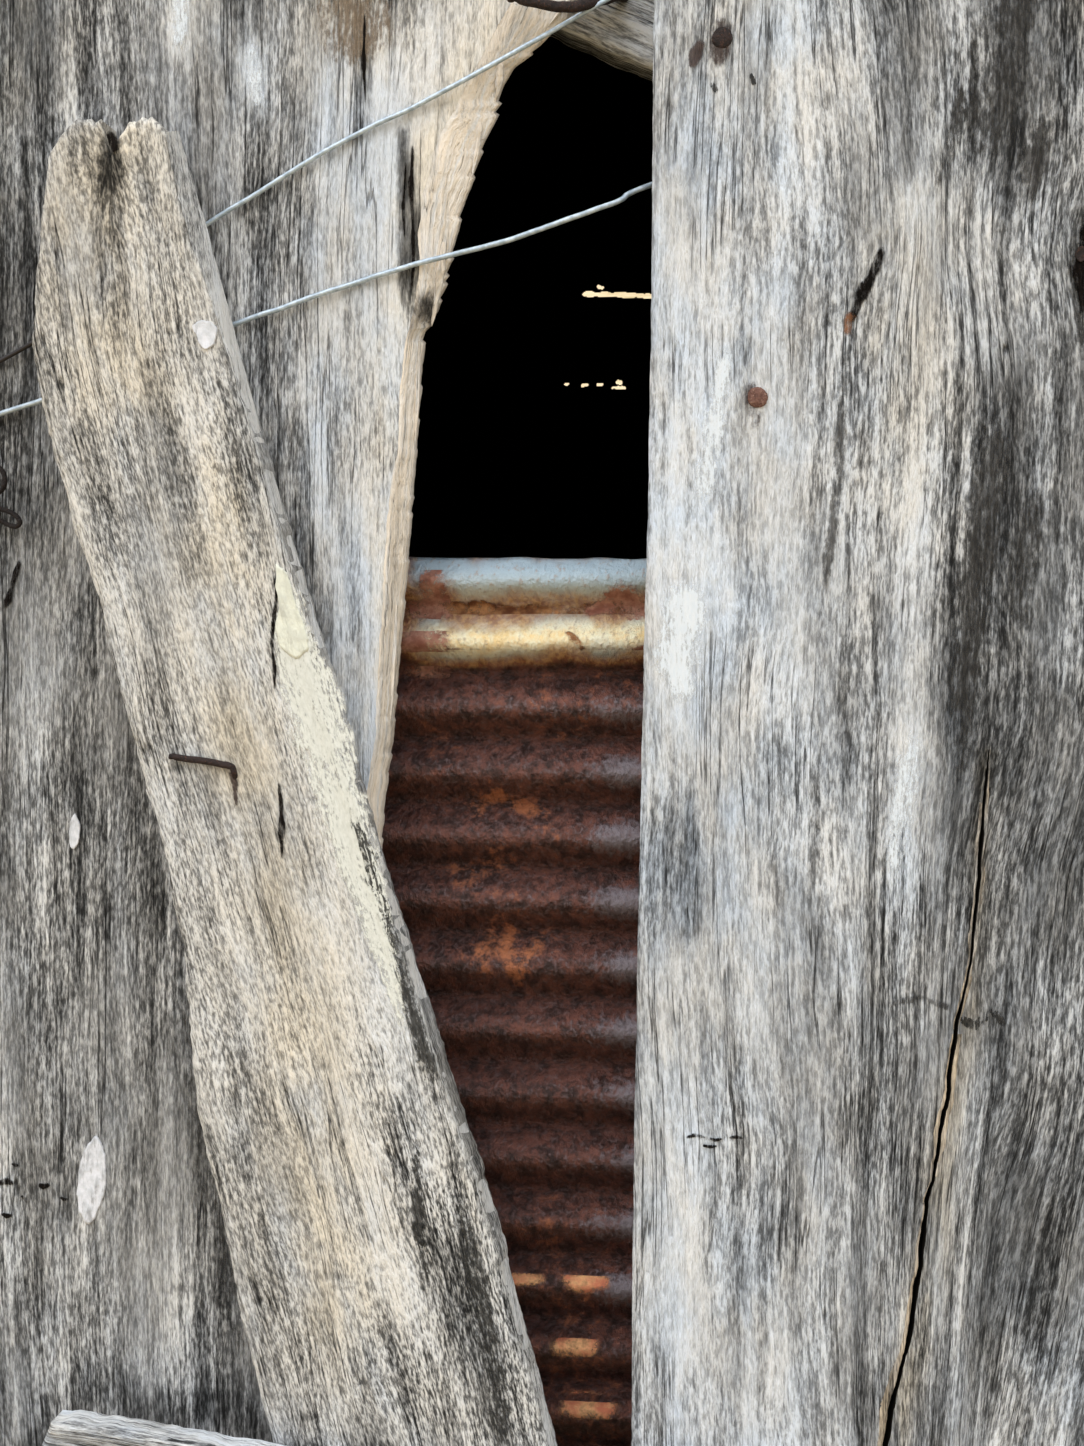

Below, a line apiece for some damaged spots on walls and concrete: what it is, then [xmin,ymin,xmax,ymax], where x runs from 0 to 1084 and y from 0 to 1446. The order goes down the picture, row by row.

corrosion [709,18,731,64]
corrosion [401,570,645,679]
crack [877,749,1005,1446]
corrosion [512,1273,540,1285]
corrosion [564,1275,608,1293]
corrosion [555,1337,597,1357]
corrosion [562,1391,615,1419]